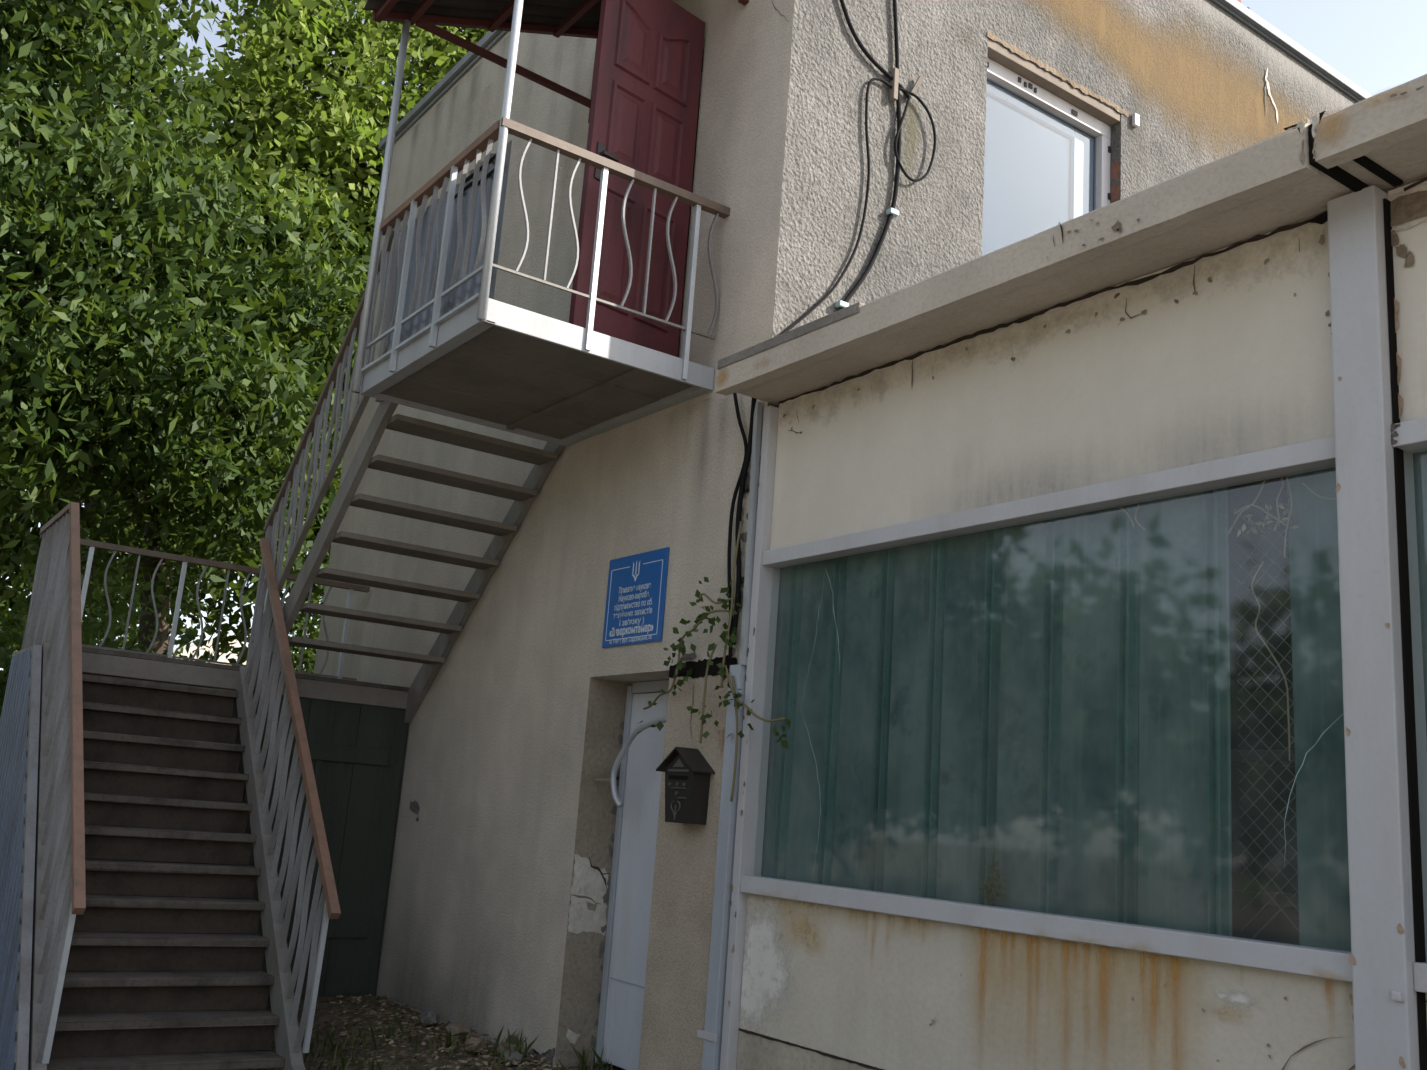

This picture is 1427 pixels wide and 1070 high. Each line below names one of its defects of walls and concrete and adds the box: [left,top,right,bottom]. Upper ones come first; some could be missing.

leakage [1255,38,1350,134]
spalling [1307,212,1328,245]
spalling [1391,191,1427,267]
flaking render [568,833,615,971]
flaking render [506,992,601,1067]